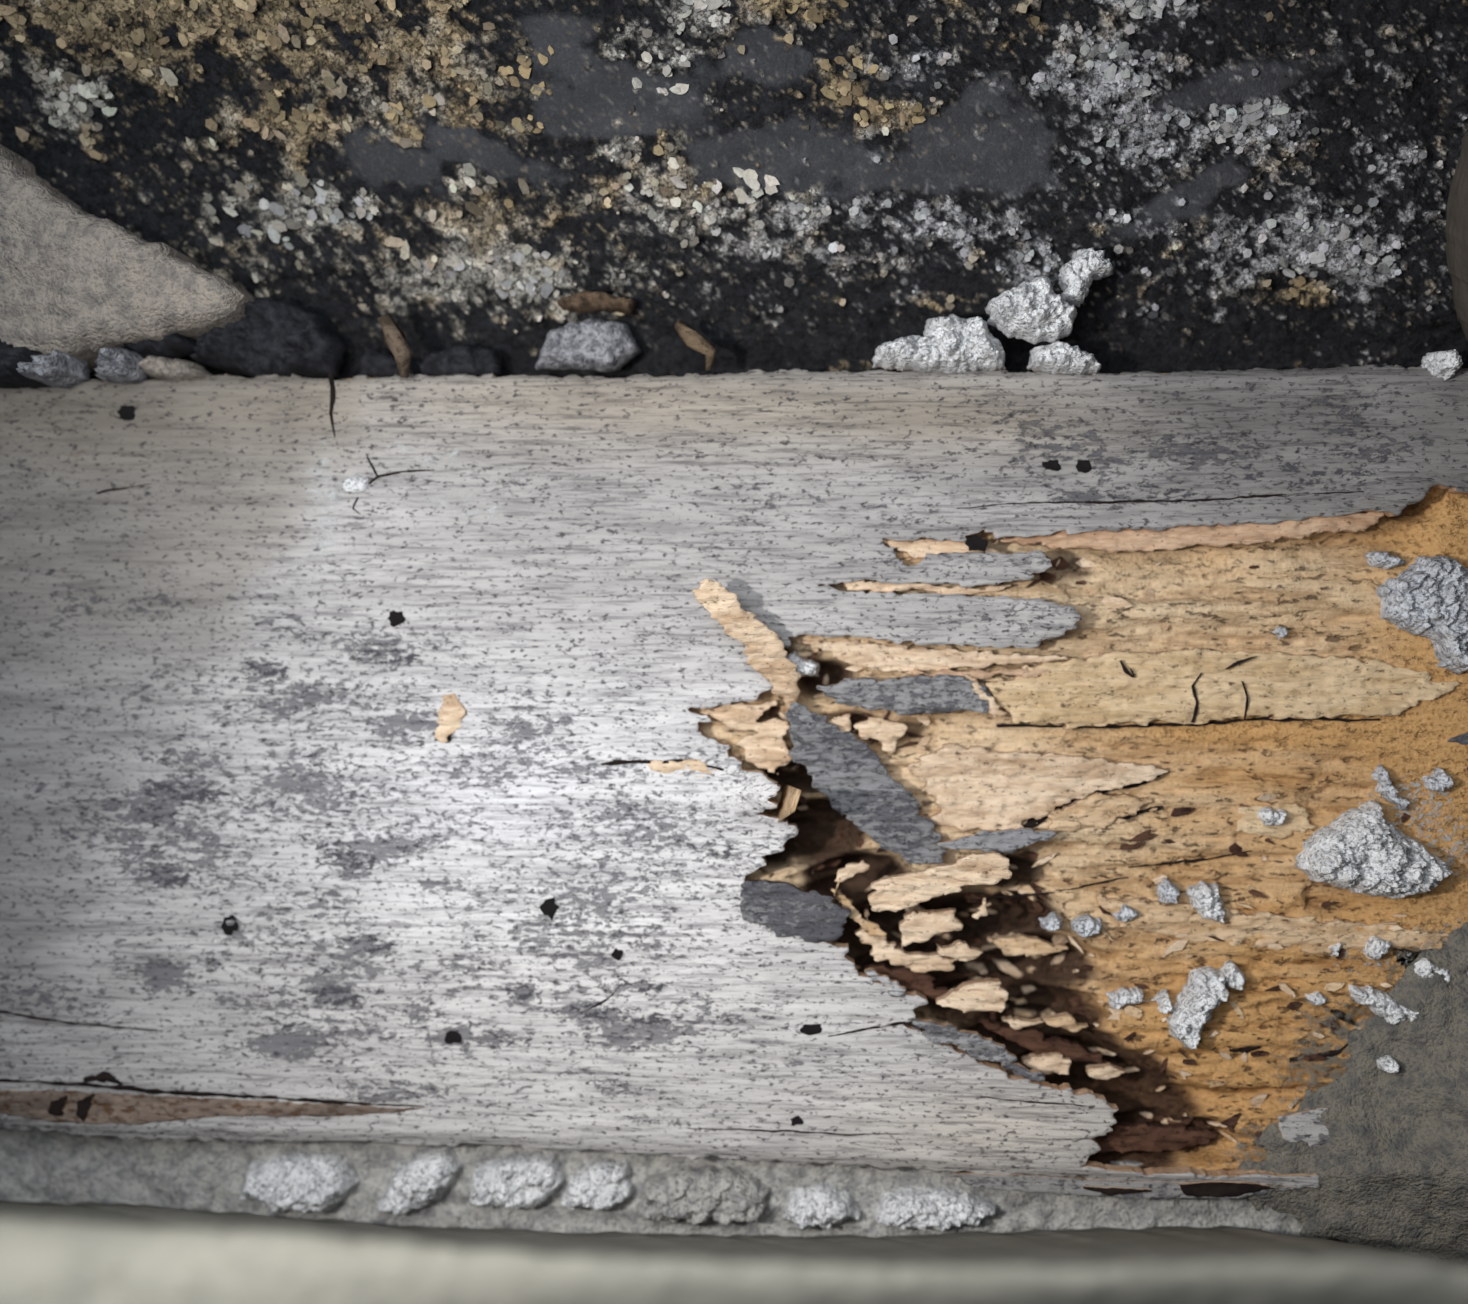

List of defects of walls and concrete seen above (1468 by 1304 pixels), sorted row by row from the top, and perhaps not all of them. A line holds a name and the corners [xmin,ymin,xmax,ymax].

peeling [1277,1108,1330,1154]